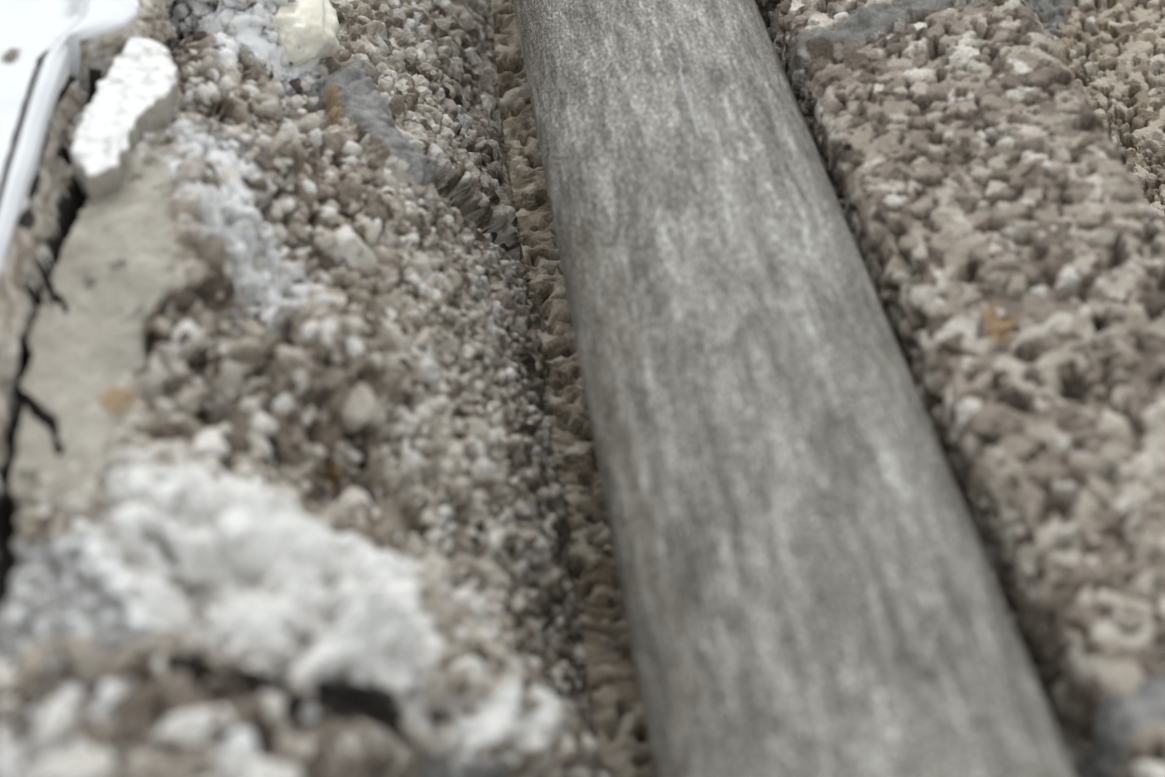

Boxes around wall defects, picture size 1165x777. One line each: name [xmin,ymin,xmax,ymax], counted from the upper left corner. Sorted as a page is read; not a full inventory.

peeling [2,48,19,62]
spalling [70,31,407,561]